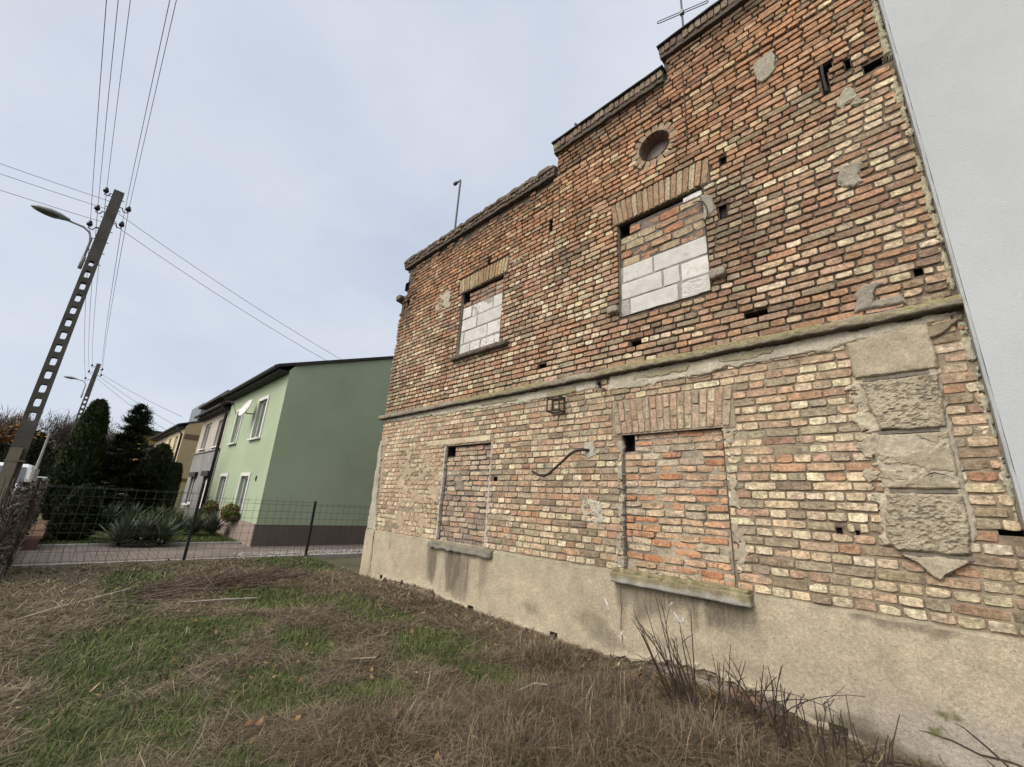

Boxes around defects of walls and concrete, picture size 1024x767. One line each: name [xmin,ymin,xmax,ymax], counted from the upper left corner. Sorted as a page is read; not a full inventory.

flaking render [383,312,959,423]
damp [429,548,458,591]